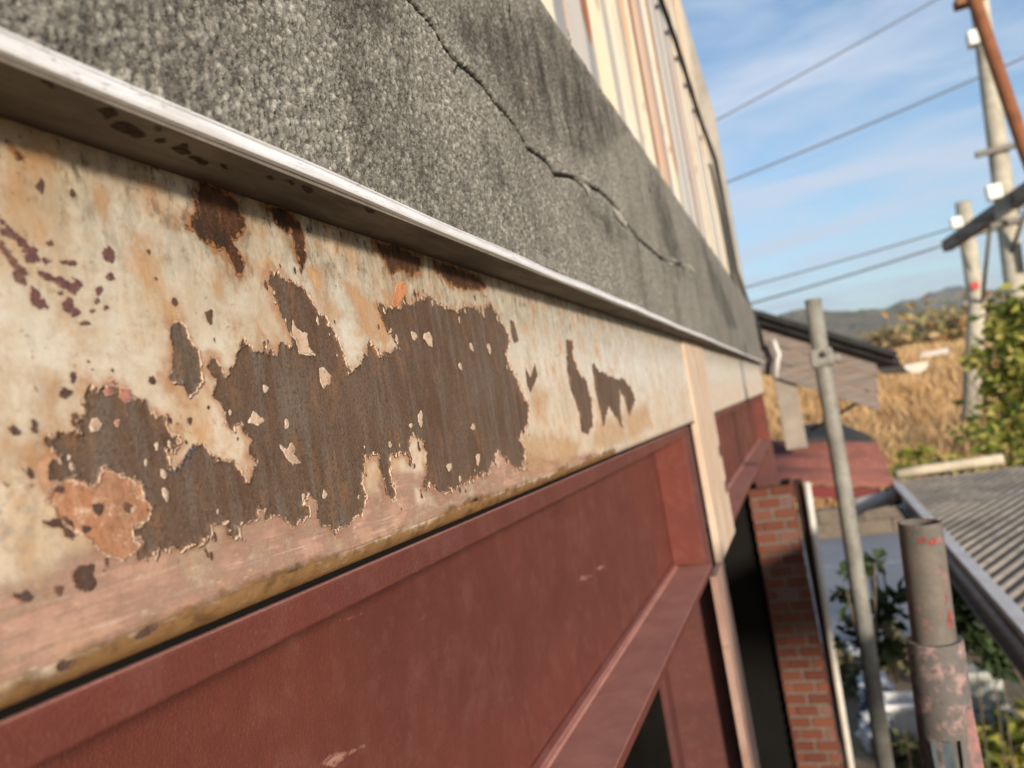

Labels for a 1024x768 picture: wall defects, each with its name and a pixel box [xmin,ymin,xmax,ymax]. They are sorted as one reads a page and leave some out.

spalling [4,133,25,162]
crack [407,0,692,273]
corrosion [29,285,48,309]
spalling [0,219,82,294]
corrosion [41,240,76,266]
corrosion [57,245,114,325]
corrosion [174,180,253,279]
corrosion [260,202,321,294]
corrosion [371,239,486,307]
peeling [566,339,636,435]
corrosion [7,419,38,436]
peeling [0,263,596,683]